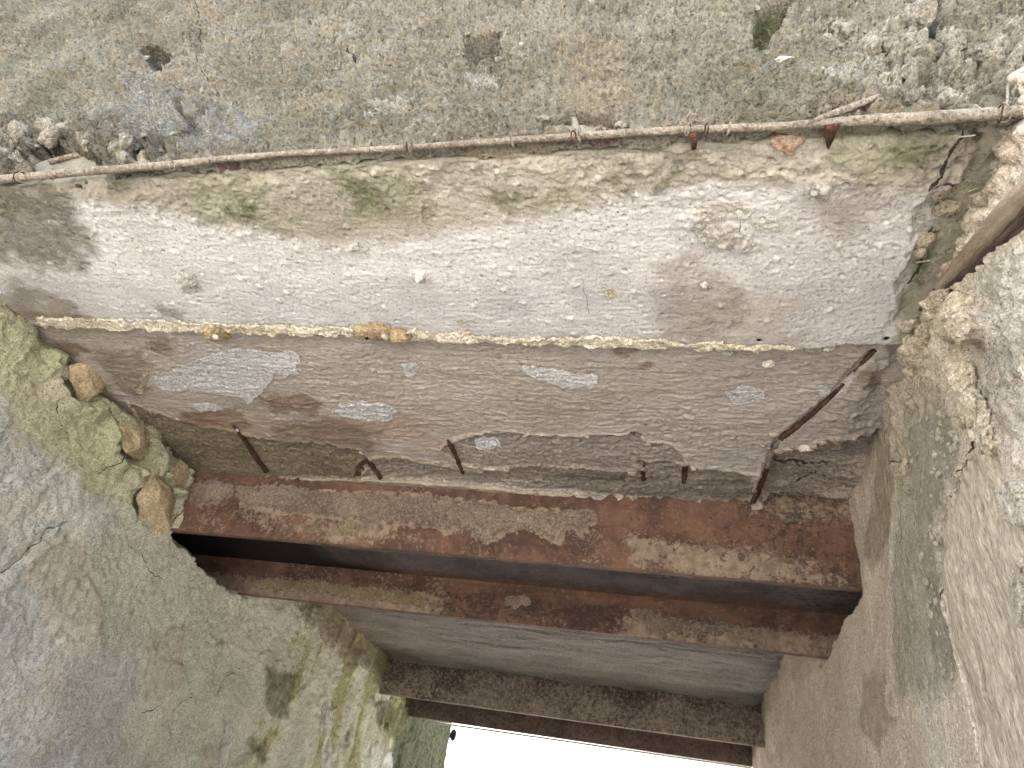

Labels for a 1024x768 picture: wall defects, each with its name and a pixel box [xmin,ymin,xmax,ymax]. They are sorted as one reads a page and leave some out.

corrosion [209,150,241,173]
spalling [0,84,1024,189]
corrosion [576,126,622,148]
crack [928,129,966,191]
water stain [0,189,94,270]
water stain [33,315,371,342]
water stain [406,321,807,354]
spalling [126,348,877,506]